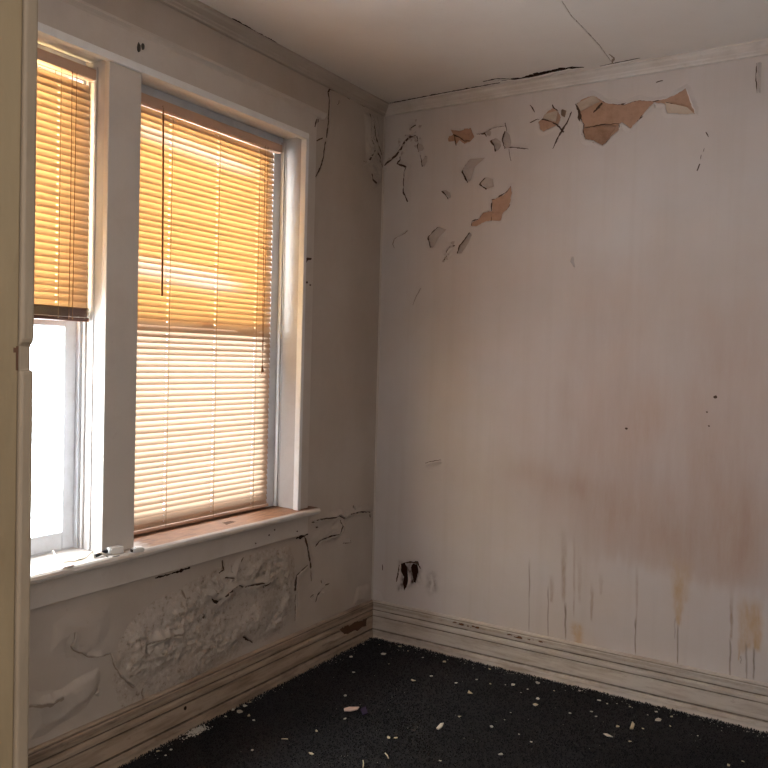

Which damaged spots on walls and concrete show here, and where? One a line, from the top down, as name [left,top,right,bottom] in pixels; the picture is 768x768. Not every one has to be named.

crack [393,0,641,103]
crack [315,87,365,180]
peeling [445,124,511,152]
peeling [530,84,699,151]
peeling [457,158,516,254]
leakage [470,222,768,683]
crack [294,504,373,621]